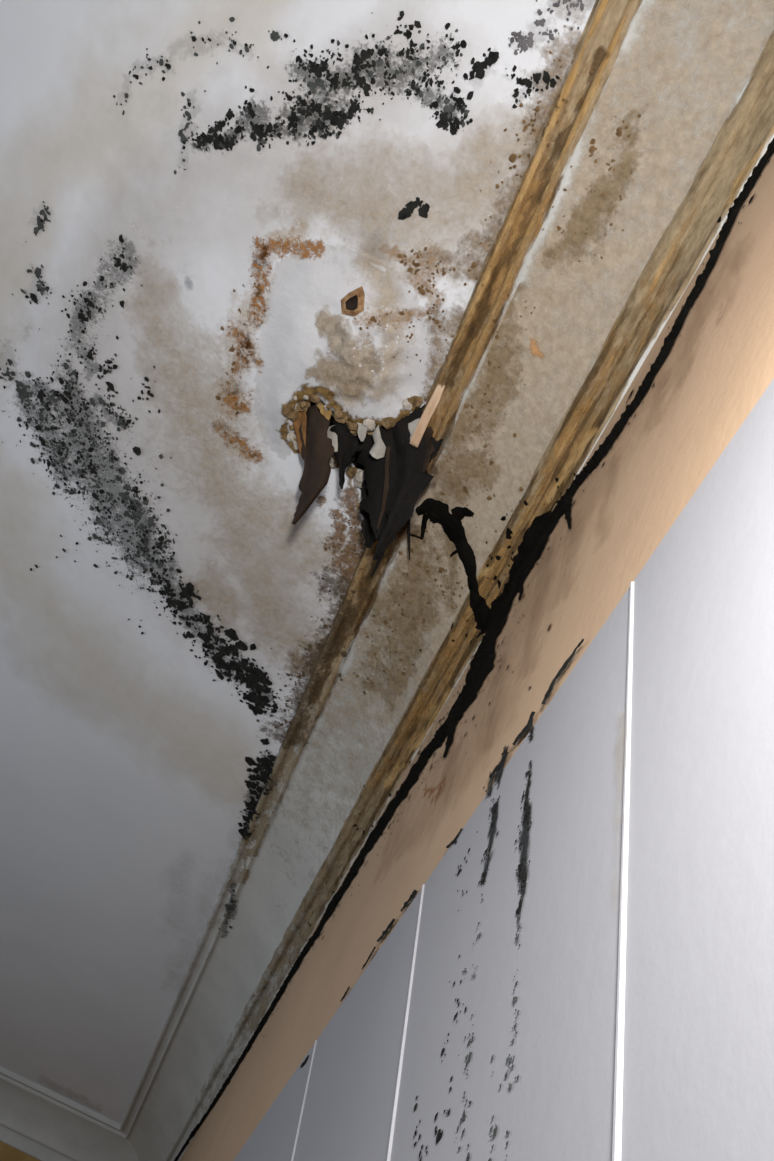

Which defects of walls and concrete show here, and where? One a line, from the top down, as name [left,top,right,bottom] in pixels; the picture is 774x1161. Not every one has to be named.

rust [215,237,325,464]
flaking render [281,384,445,576]
leakage [0,0,774,840]
rust [239,0,774,1036]
crack [174,138,774,1161]
leakage [457,639,584,901]
leakage [515,760,532,947]
leakage [413,955,478,1161]
leakage [488,1115,510,1161]
leakage [491,970,519,1090]